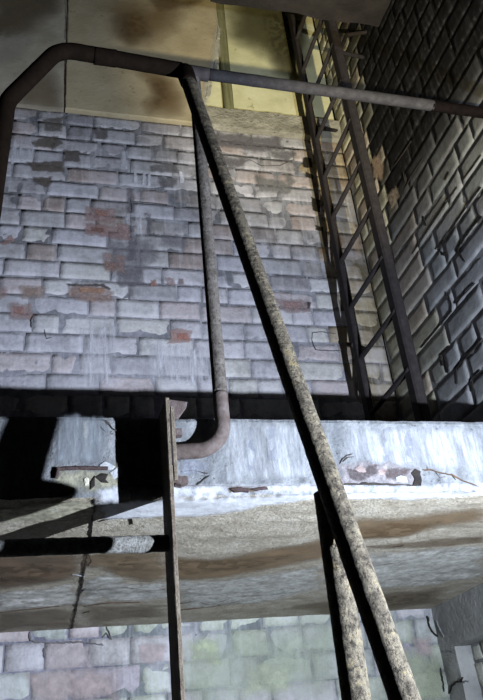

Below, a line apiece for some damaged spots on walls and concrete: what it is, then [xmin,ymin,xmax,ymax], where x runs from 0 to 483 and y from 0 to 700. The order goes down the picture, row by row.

peeling [372,156,384,179]
peeling [85,207,130,240]
peeling [10,286,44,319]
peeling [68,284,112,302]
peeling [169,329,191,343]
spalling [340,462,422,486]
crack [423,469,479,487]
crack [90,500,142,537]
crack [29,554,112,658]